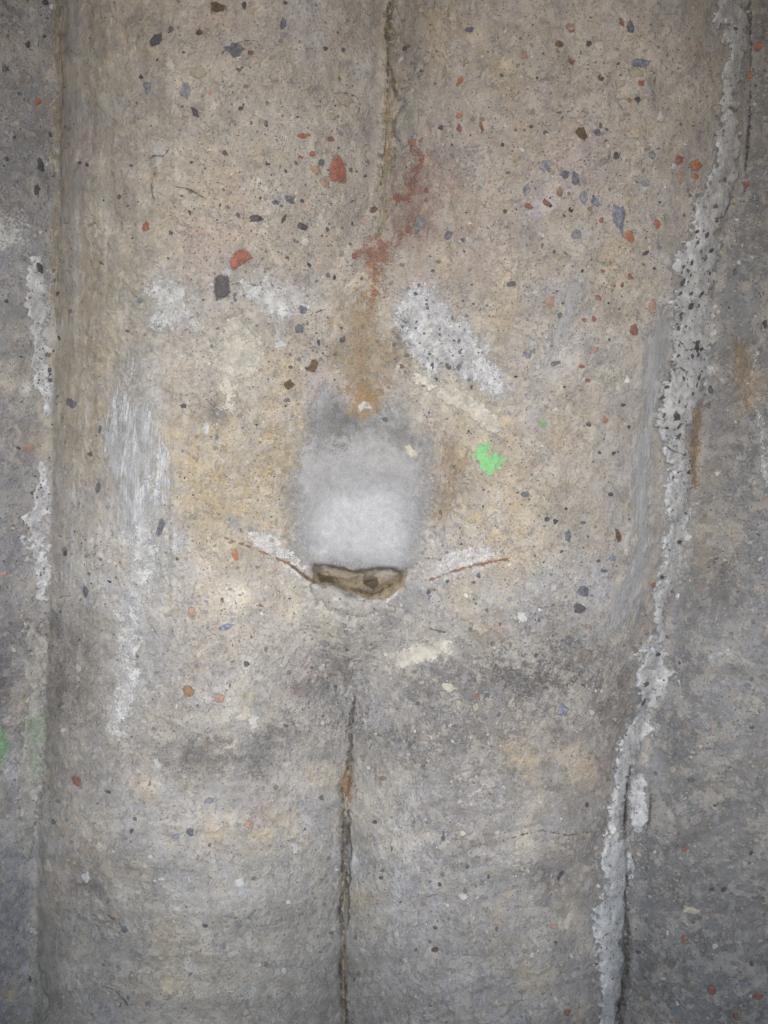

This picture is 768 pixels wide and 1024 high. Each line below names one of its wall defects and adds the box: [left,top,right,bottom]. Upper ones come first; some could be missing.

crack [380,0,397,185]
rust [392,138,425,203]
rust [340,217,416,420]
leakage [688,409,703,489]
crack [224,524,316,584]
hole [310,556,408,603]
crack [429,544,510,586]
crack [338,696,356,1024]